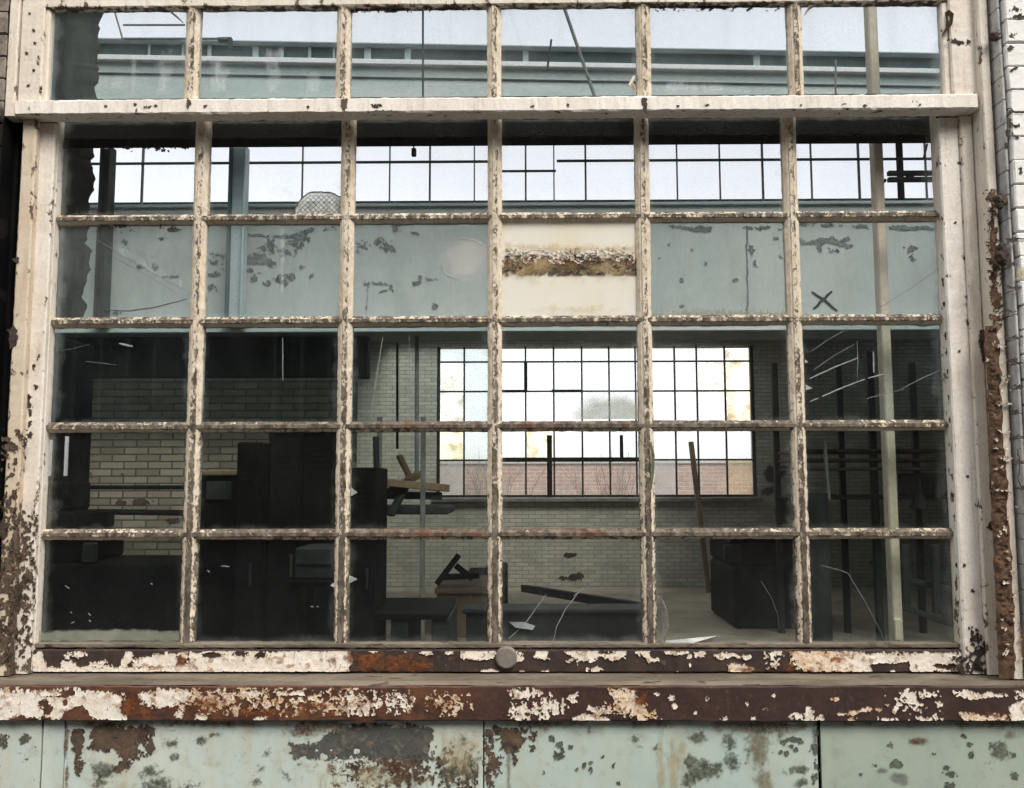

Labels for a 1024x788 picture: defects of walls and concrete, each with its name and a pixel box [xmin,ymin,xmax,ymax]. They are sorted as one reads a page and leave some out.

peeling [247,226,336,287]
peeling [506,247,636,264]
peeling [799,223,869,253]
corrosion [982,189,1024,678]
peeling [0,384,353,672]
peeling [404,651,499,672]
peeling [516,651,550,672]
peeling [564,626,987,675]
corrosion [196,699,348,736]
peeling [0,687,678,788]
corrosion [598,686,660,711]
peeling [779,736,820,784]